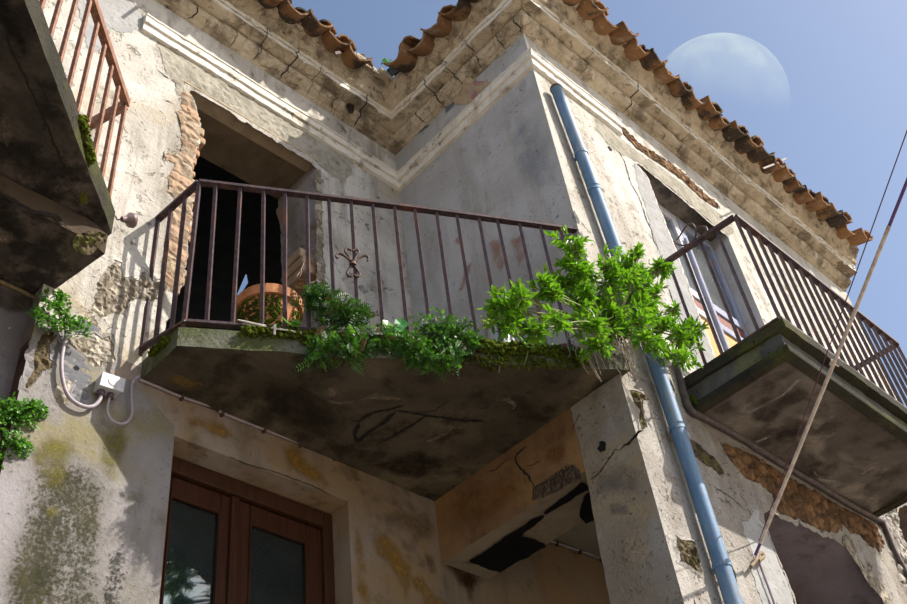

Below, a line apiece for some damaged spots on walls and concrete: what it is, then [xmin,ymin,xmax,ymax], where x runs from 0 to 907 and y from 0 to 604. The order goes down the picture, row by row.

spalling [18,38,358,408]
mould [4,442,126,604]
crack [353,400,496,442]
spalling [533,465,581,501]
crack [592,417,643,478]
spalling [688,436,907,604]